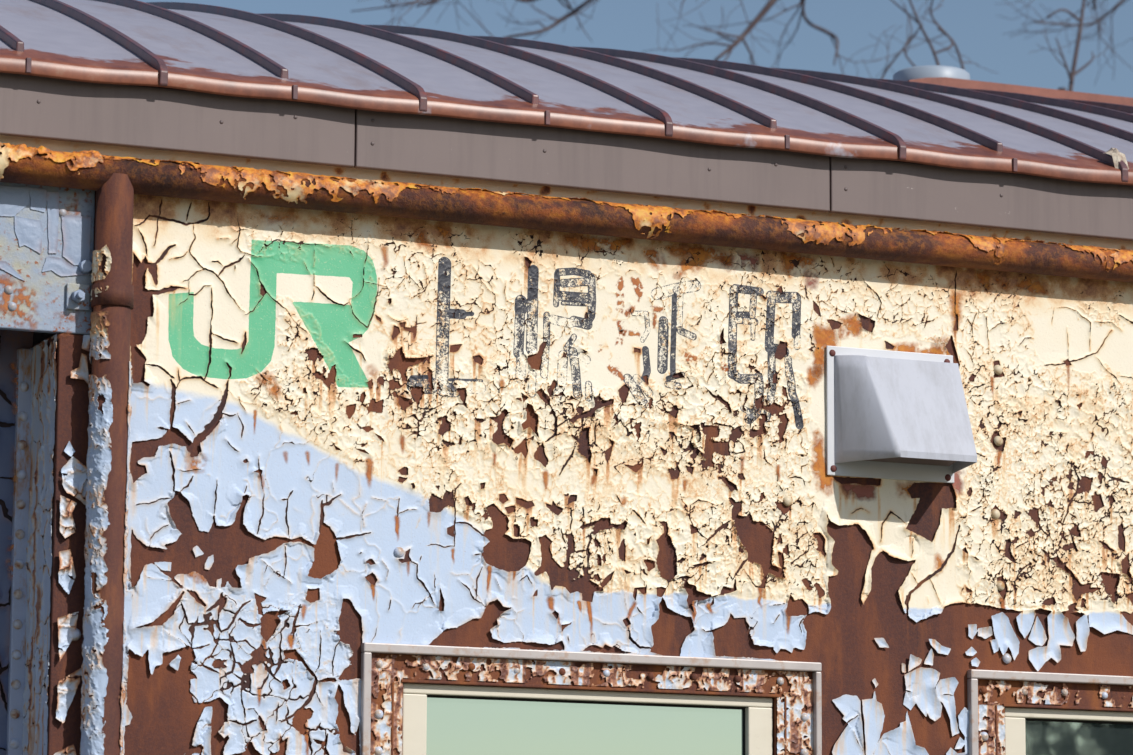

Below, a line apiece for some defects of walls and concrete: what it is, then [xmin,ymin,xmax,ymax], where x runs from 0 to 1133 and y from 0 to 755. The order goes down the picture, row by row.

peeling [0,143,1133,302]
corrosion [565,237,631,252]
corrosion [644,246,759,277]
corrosion [783,254,817,287]
corrosion [808,316,862,385]
crack [0,477,13,522]
peeling [22,311,113,755]
peeling [119,253,1133,755]
crack [127,199,1133,755]
corrosion [812,431,875,499]